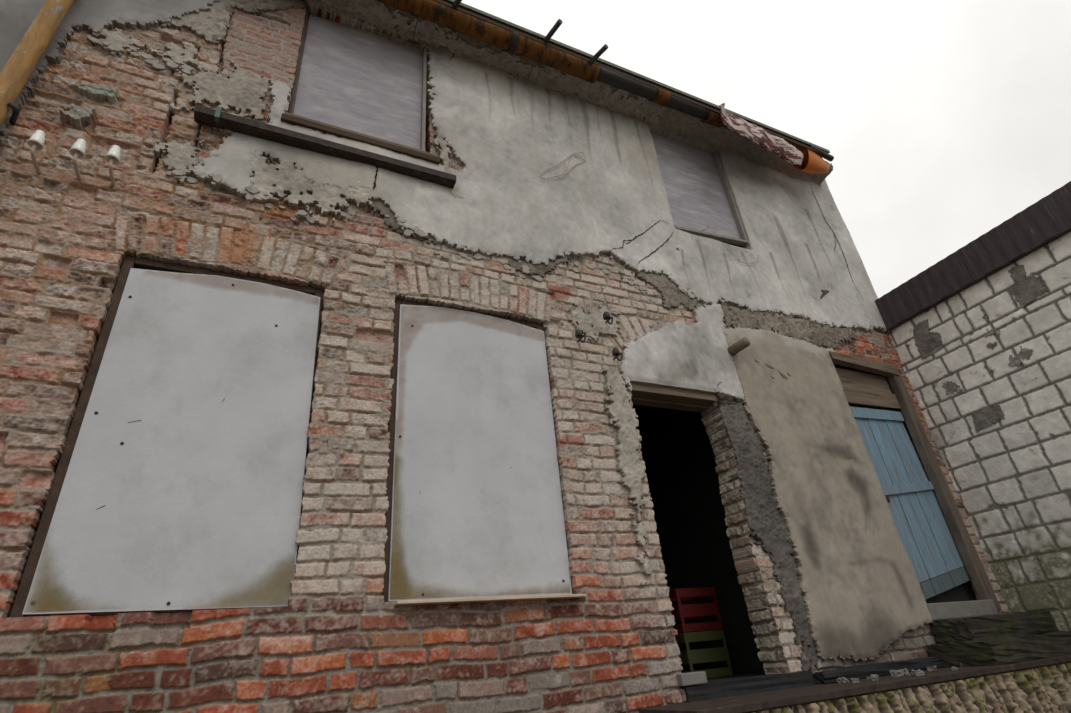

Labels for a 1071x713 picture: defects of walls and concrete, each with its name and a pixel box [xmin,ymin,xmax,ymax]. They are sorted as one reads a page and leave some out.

spalling [87,28,271,121]
peeling [312,0,667,126]
spalling [154,140,222,186]
spalling [432,129,464,199]
spalling [241,142,482,260]
crack [608,220,674,265]
peeling [501,256,698,312]
spalling [561,302,626,342]
spalling [719,302,855,350]
spalling [602,366,654,585]
spalling [712,391,824,673]